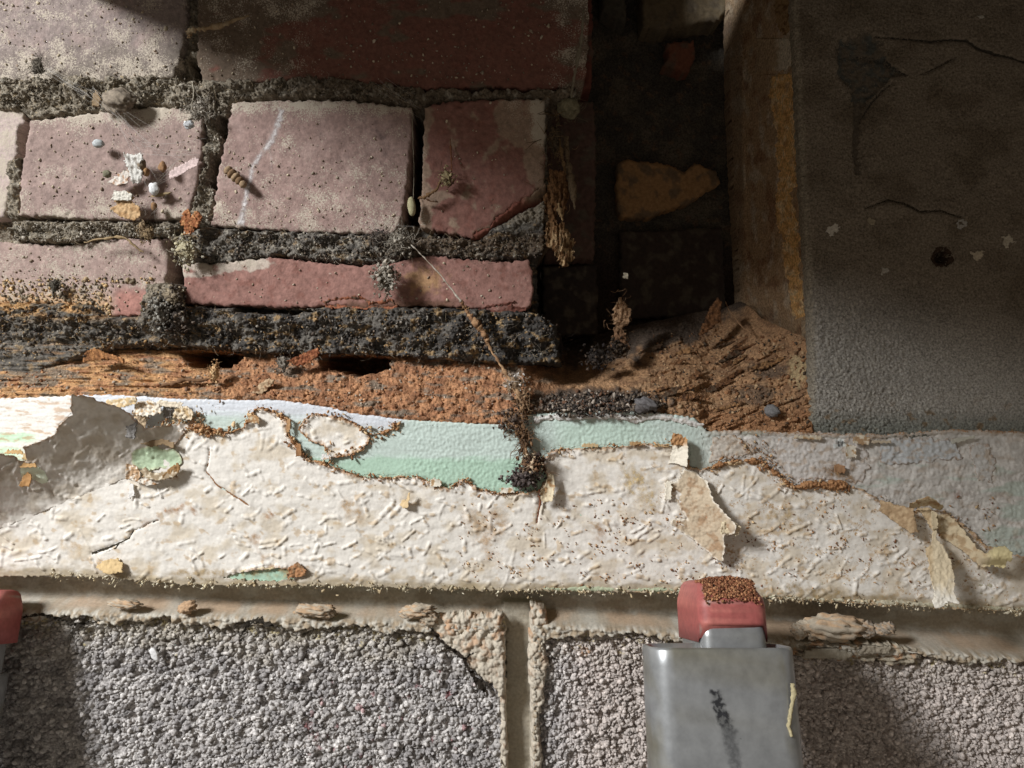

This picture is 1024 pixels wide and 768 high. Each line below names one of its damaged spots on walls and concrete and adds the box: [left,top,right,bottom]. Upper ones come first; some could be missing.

crack [856,36,1024,118]
crack [865,199,961,218]
peeling [0,398,72,487]
peeling [106,397,1024,554]